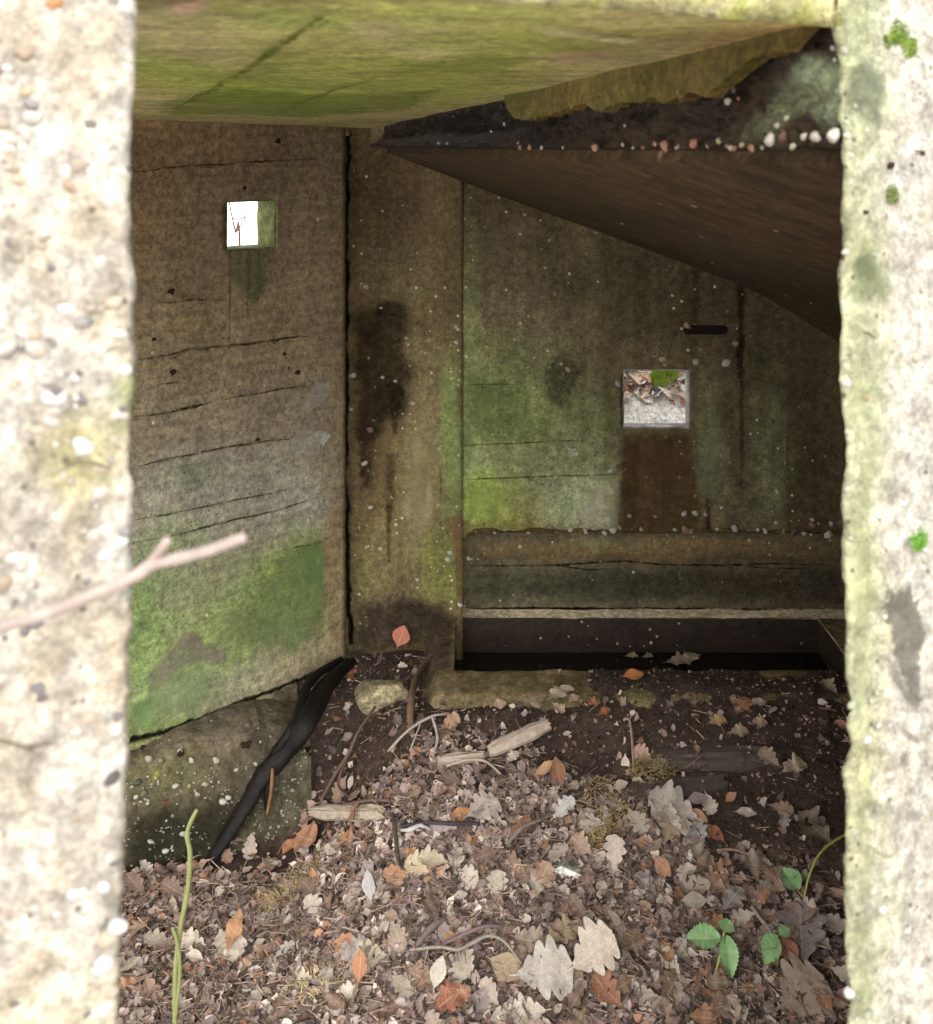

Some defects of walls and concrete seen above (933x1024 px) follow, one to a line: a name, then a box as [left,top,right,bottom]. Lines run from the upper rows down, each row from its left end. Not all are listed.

spalling [369,26,867,154]
crack [134,158,320,172]
crack [146,335,309,384]
crack [134,383,317,417]
crack [298,132,354,644]
leakage [355,302,410,486]
crack [141,439,288,466]
crack [133,490,314,543]
crack [464,561,822,570]